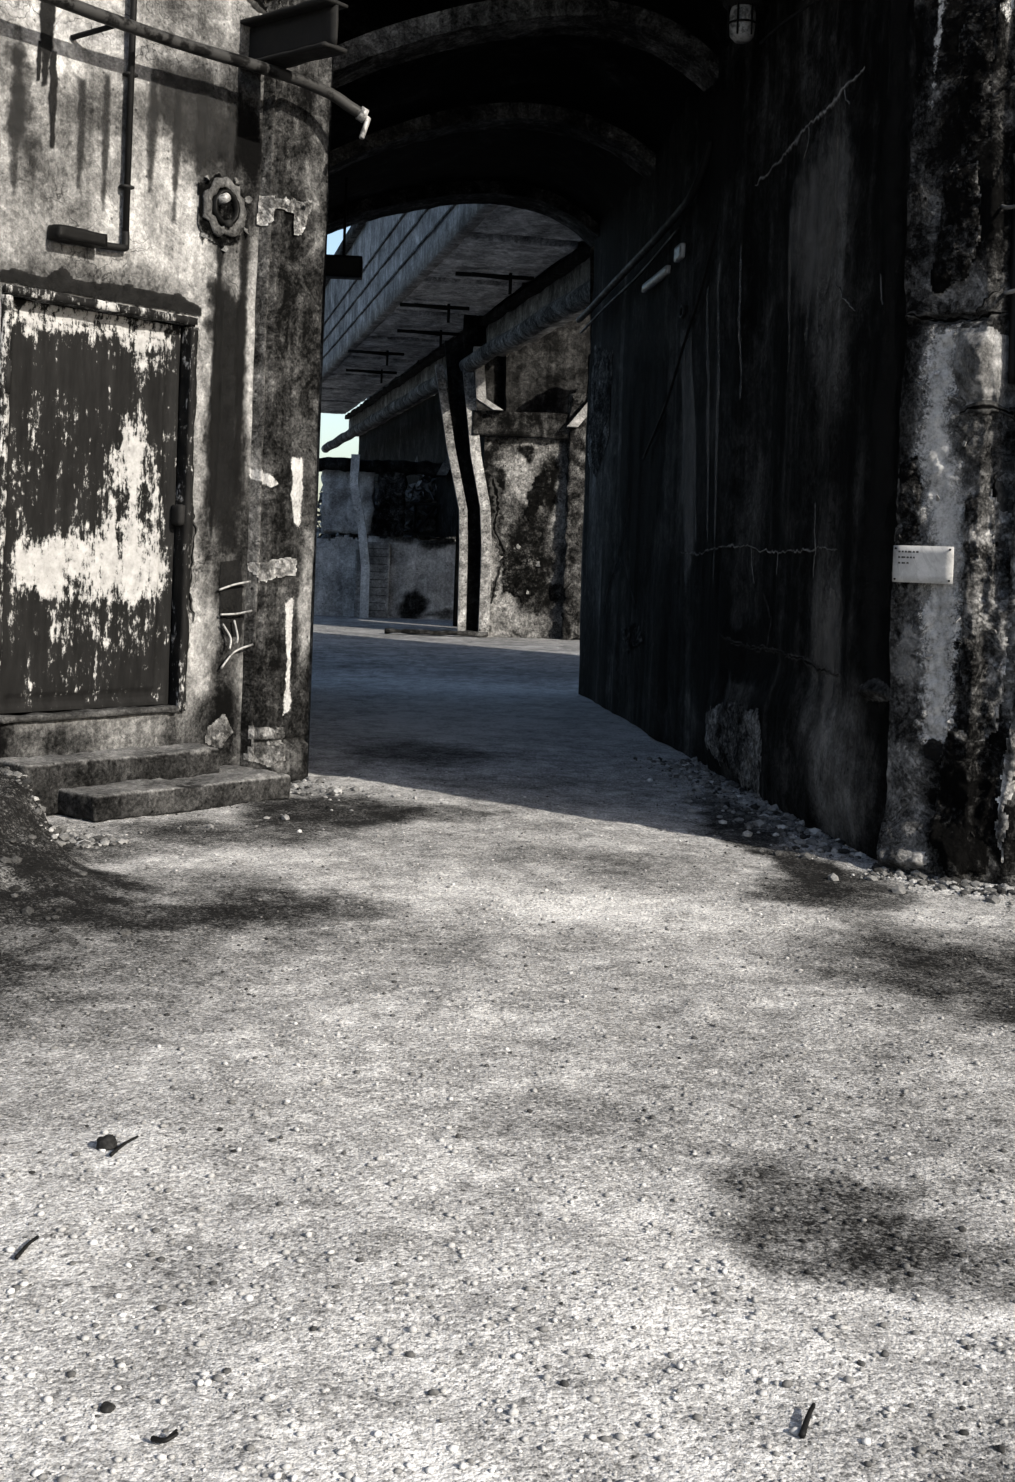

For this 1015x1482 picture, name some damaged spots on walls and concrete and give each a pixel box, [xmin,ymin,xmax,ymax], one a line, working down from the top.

leakage [4,27,42,194]
leakage [77,78,86,187]
leakage [101,75,111,204]
crack [681,503,838,583]